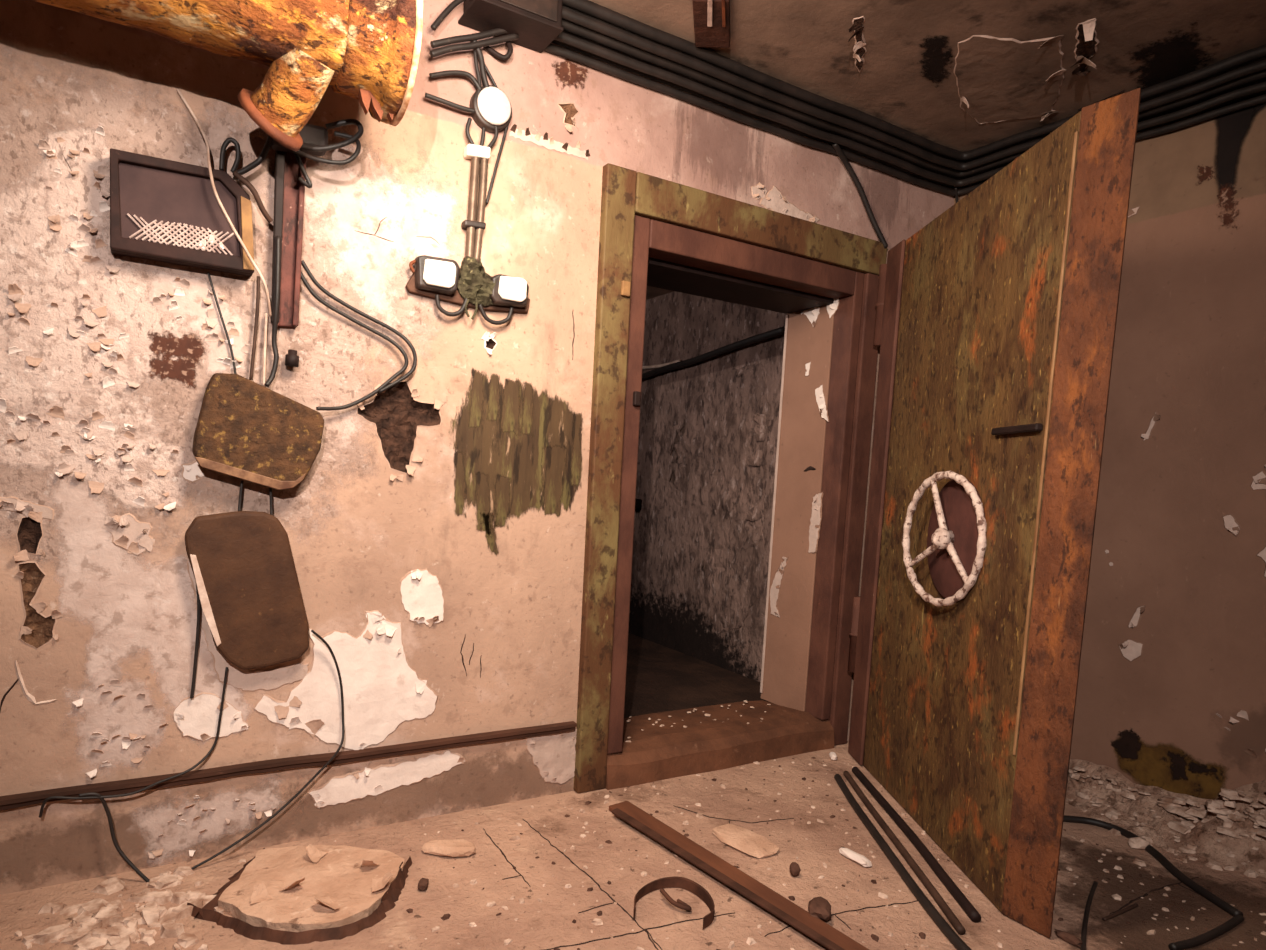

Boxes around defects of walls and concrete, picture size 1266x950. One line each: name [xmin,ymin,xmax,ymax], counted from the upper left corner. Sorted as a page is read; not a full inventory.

damp [919,35,953,87]
peeling [954,18,1099,124]
damp [1129,22,1219,89]
damp [1217,184,1239,228]
peeling [0,126,205,556]
peeling [149,272,252,373]
spalling [357,380,444,482]
damp [452,368,583,555]
spalling [0,496,63,650]
peeling [66,559,444,778]
peeling [308,750,466,808]
damp [1111,729,1226,800]